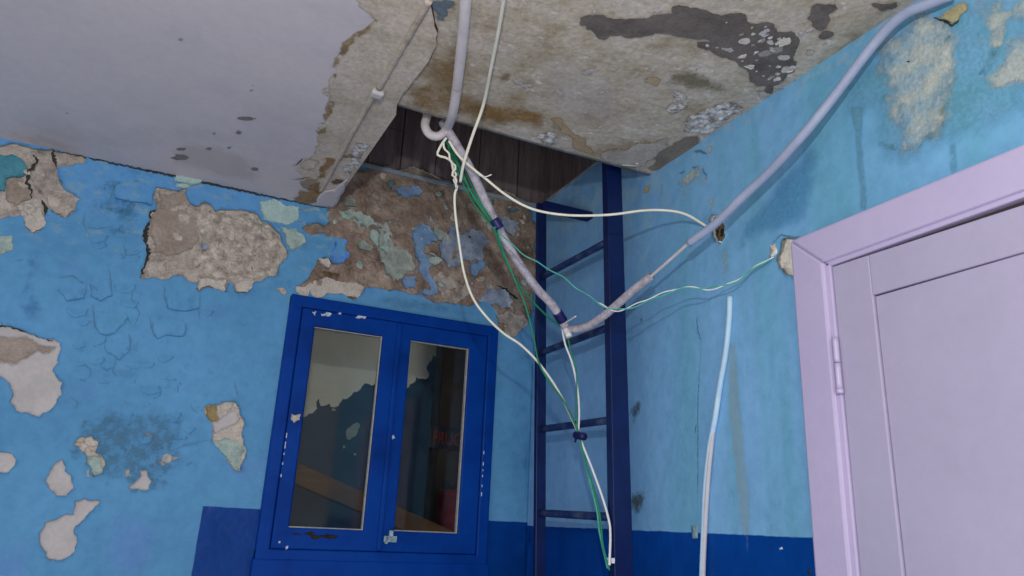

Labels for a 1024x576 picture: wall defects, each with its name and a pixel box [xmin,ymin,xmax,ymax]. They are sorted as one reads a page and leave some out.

flaking render [877,3,967,150]
flaking render [979,1,1024,87]
flaking render [0,144,86,233]
flaking render [140,0,536,338]
flaking render [0,324,62,417]
flaking render [0,452,16,473]
flaking render [74,436,105,477]
water stain [83,418,174,491]
flaking render [204,402,246,471]
flaking render [40,460,100,561]